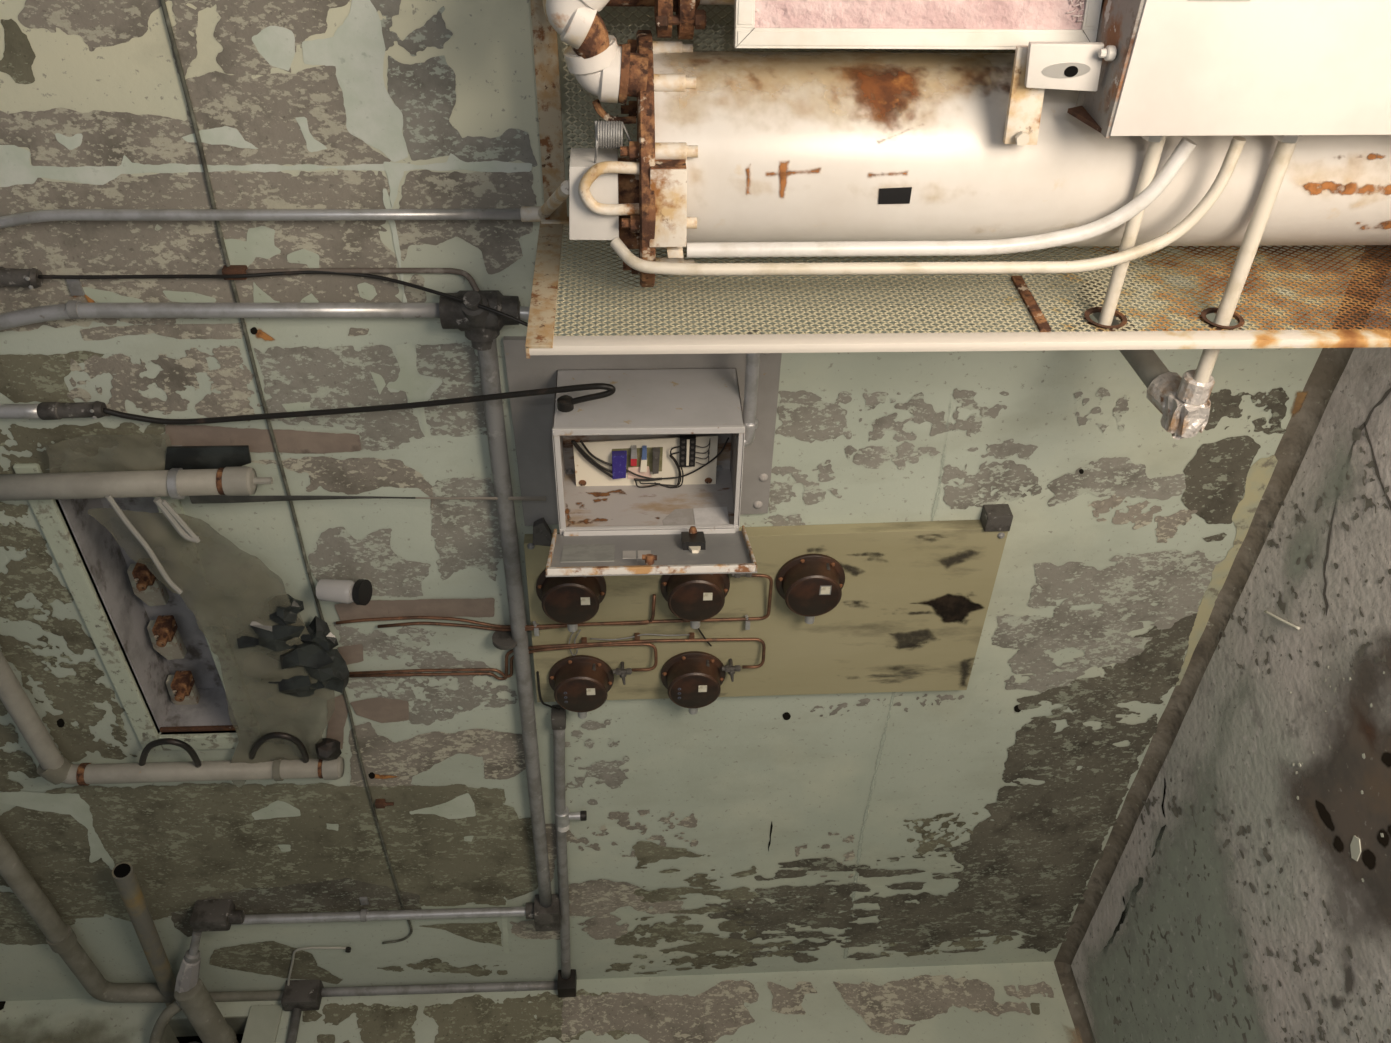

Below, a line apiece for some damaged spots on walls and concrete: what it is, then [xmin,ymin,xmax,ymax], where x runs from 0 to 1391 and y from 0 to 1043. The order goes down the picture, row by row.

peeling [0,387,1289,1043]
damp [1283,638,1391,936]